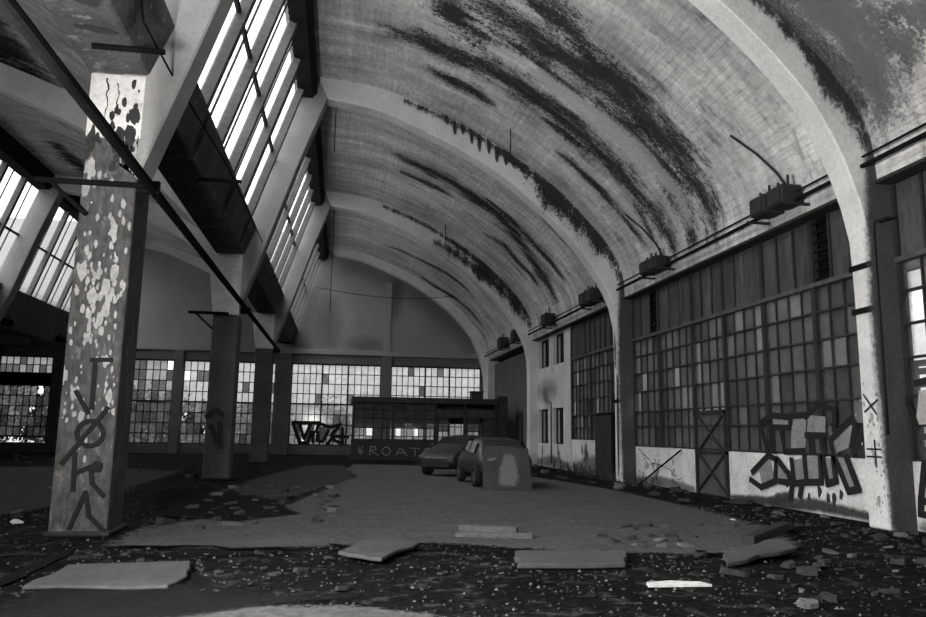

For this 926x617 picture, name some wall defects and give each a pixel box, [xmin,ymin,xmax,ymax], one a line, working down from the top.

leakage [0,45,40,79]
peeling [81,79,140,204]
leakage [426,66,497,107]
leakage [399,98,622,280]
leakage [525,0,600,66]
leakage [459,24,699,249]
leakage [749,0,926,151]
peeling [60,194,131,423]
leakage [383,205,532,329]